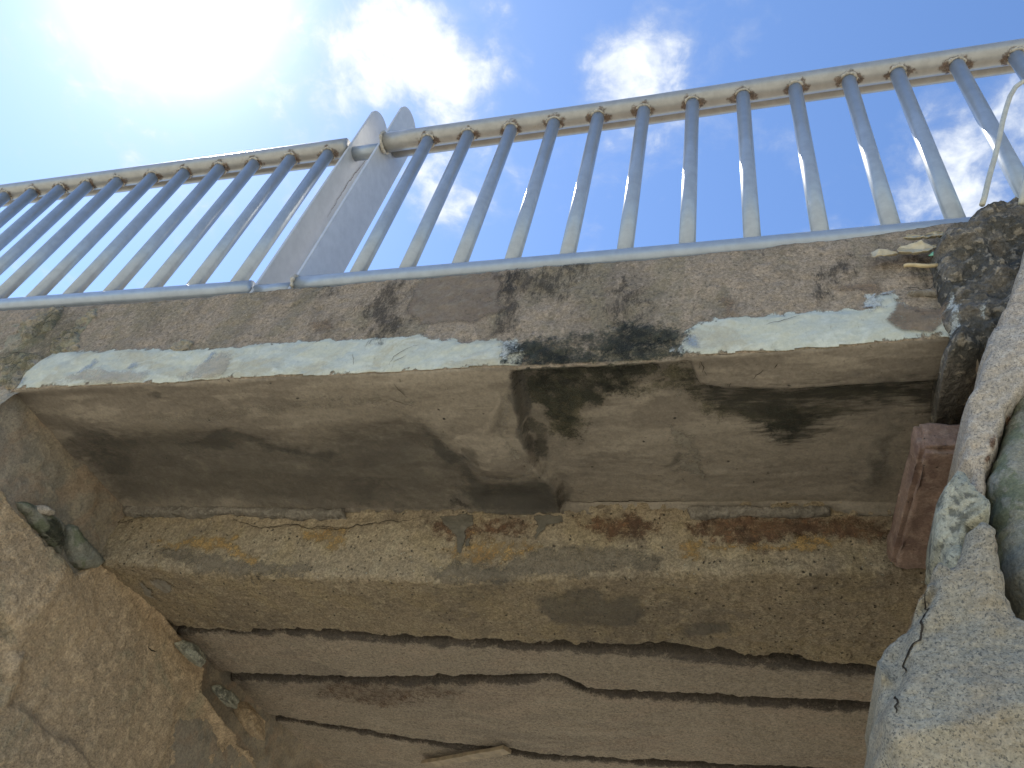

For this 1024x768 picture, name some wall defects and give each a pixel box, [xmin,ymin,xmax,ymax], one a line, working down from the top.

spalling [887,289,945,332]
peeling [0,306,98,390]
peeling [170,339,194,351]
leakage [452,370,560,515]
corrosion [575,512,665,541]
corrosion [685,516,890,554]
crack [893,590,929,713]